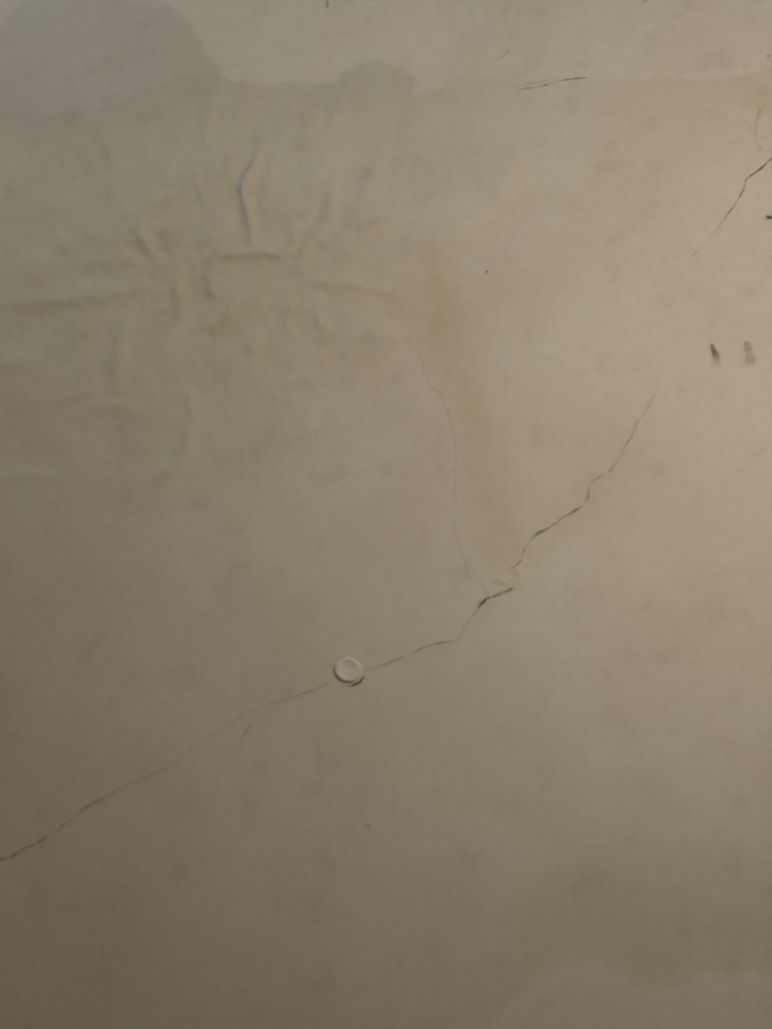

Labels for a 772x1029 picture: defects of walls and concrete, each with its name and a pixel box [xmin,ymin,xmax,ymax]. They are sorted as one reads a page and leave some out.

crack [707,157,772,243]
damp [709,342,723,369]
crack [0,391,657,862]
damp [490,825,772,1006]